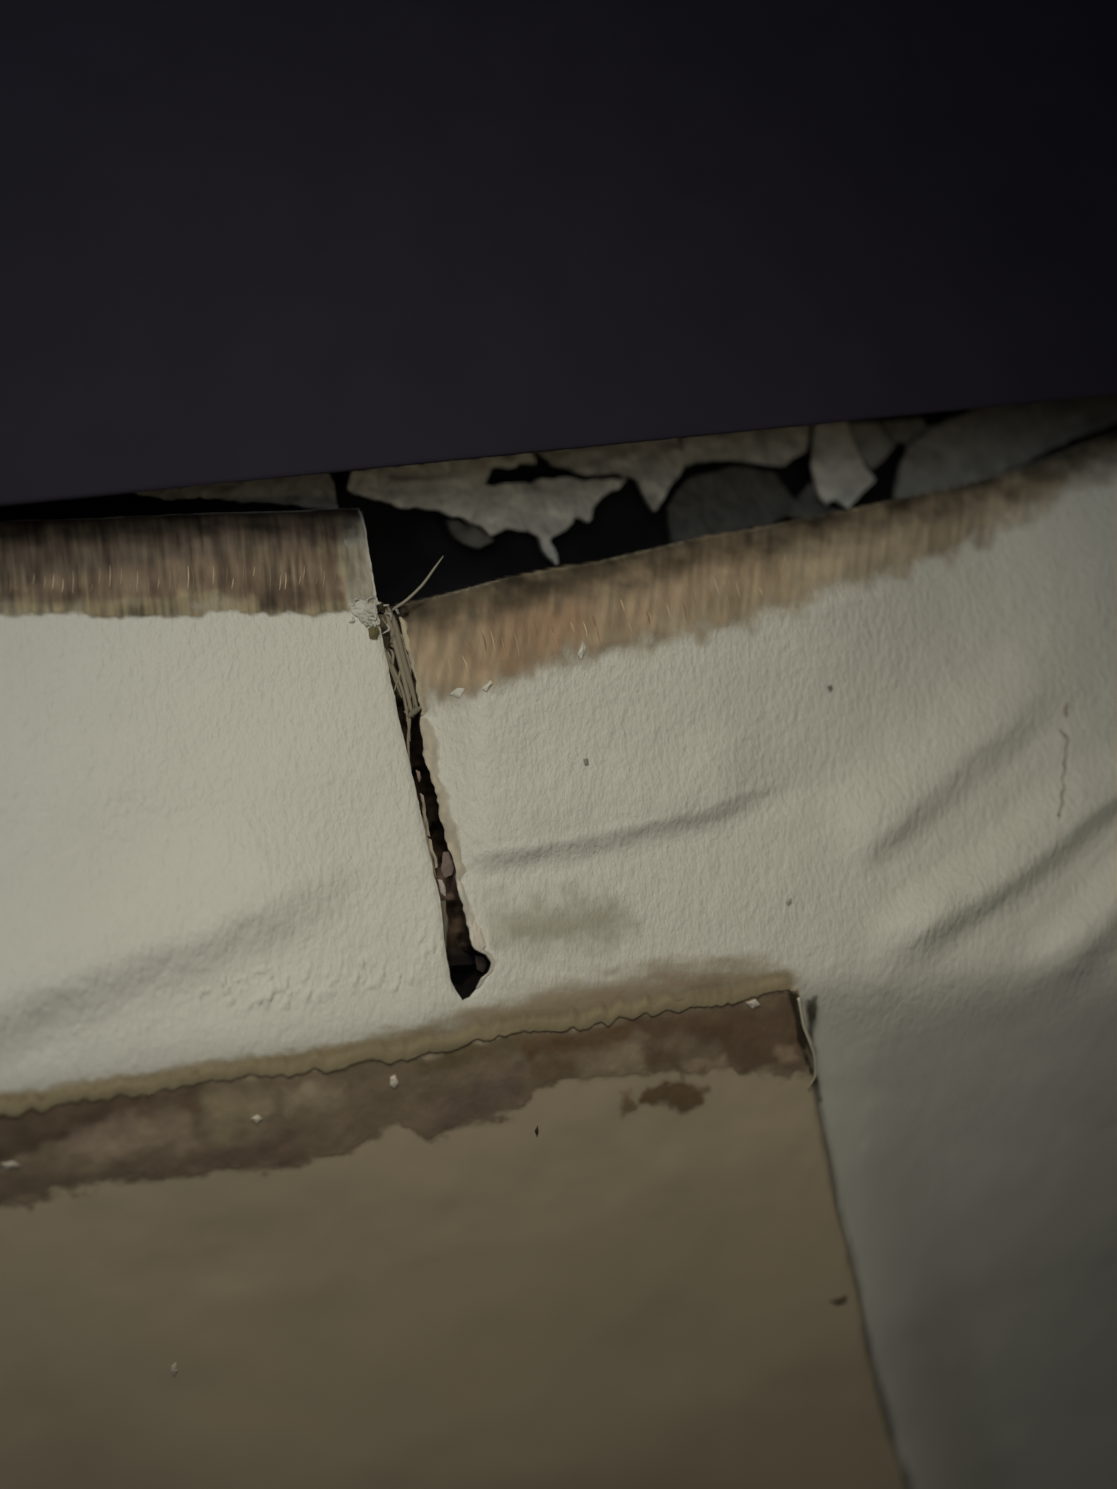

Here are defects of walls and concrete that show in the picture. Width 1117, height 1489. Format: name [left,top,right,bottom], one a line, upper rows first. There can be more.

spalling [0,395,1117,618]
crack [349,511,494,1000]
damp [268,1027,441,1060]
damp [459,971,789,1024]